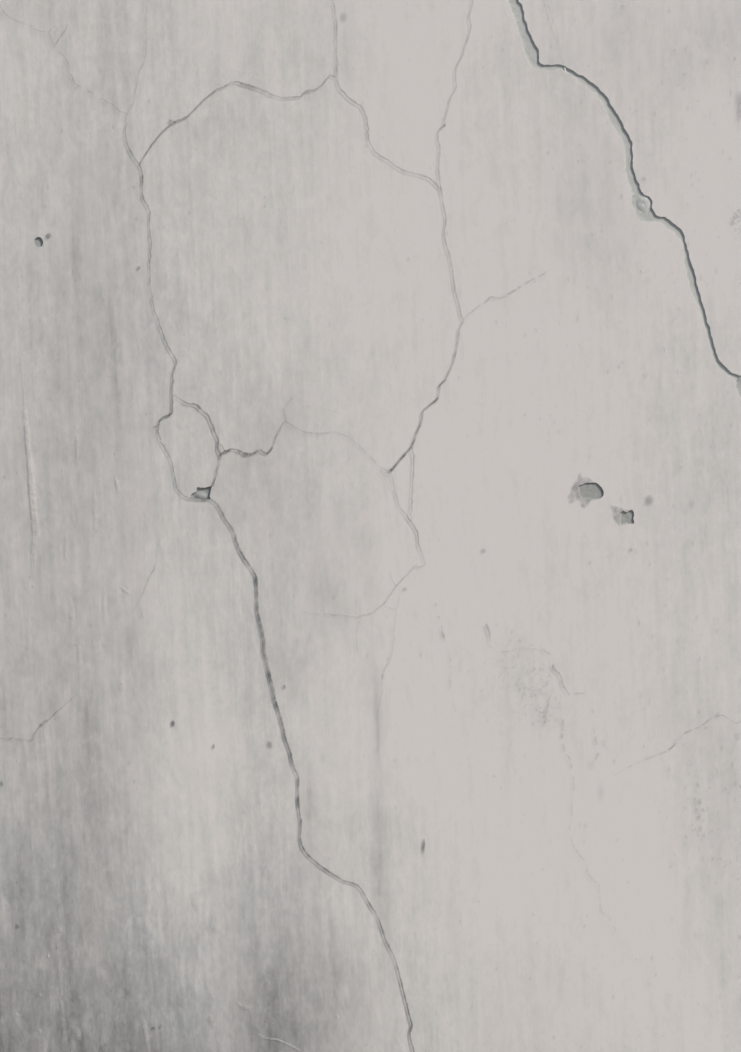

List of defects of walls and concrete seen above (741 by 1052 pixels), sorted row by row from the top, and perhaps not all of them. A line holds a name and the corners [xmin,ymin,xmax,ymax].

crack [507,0,739,381]
crack [157,345,414,1052]
spalling [579,482,604,499]
spalling [620,510,634,524]